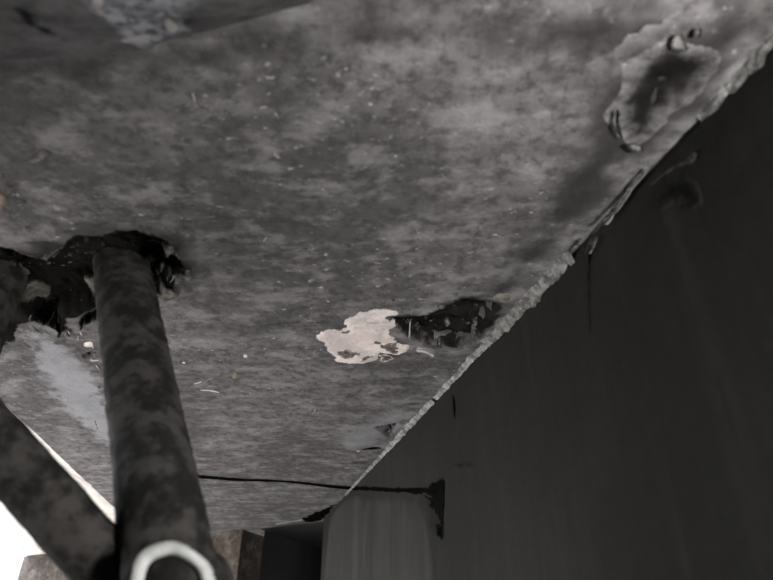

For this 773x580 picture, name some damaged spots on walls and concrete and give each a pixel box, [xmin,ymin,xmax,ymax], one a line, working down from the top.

spalling [0,217,192,369]
spalling [315,293,512,364]